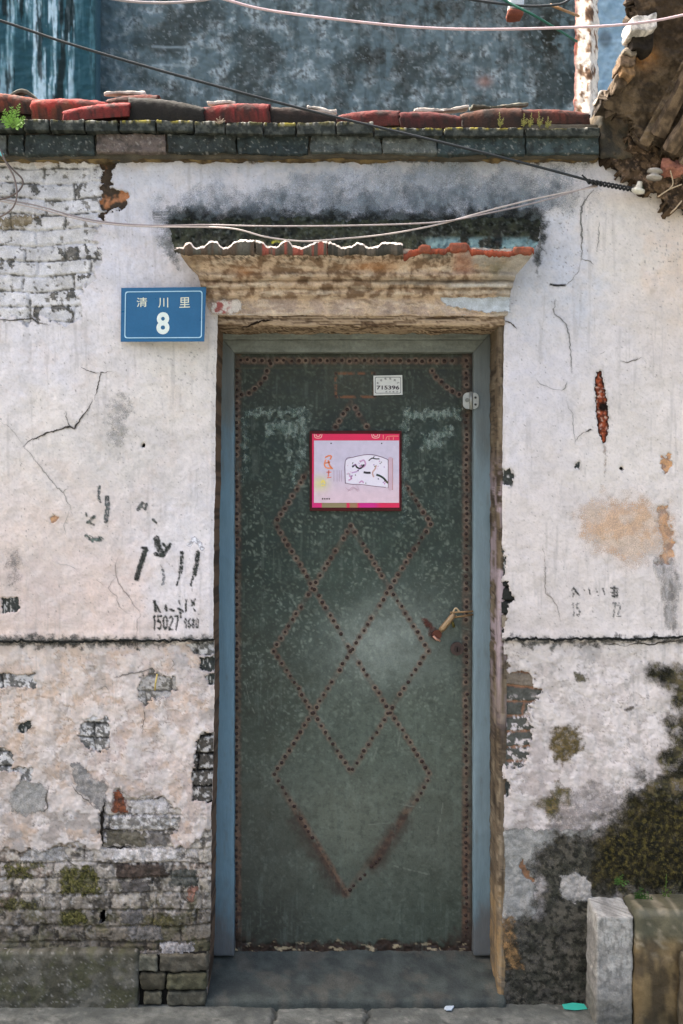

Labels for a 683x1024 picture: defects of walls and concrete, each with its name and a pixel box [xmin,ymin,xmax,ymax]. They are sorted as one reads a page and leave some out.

flaking render [0,162,130,327]
water stain [152,161,575,263]
crack [536,192,600,440]
crack [4,367,108,534]
spalling [594,371,609,465]
crack [502,545,683,651]
peeling [0,747,48,817]
flaking render [77,715,110,753]
peeling [191,732,214,803]
flaking render [505,655,543,797]
flaking render [0,762,212,954]
water stain [503,781,621,1005]